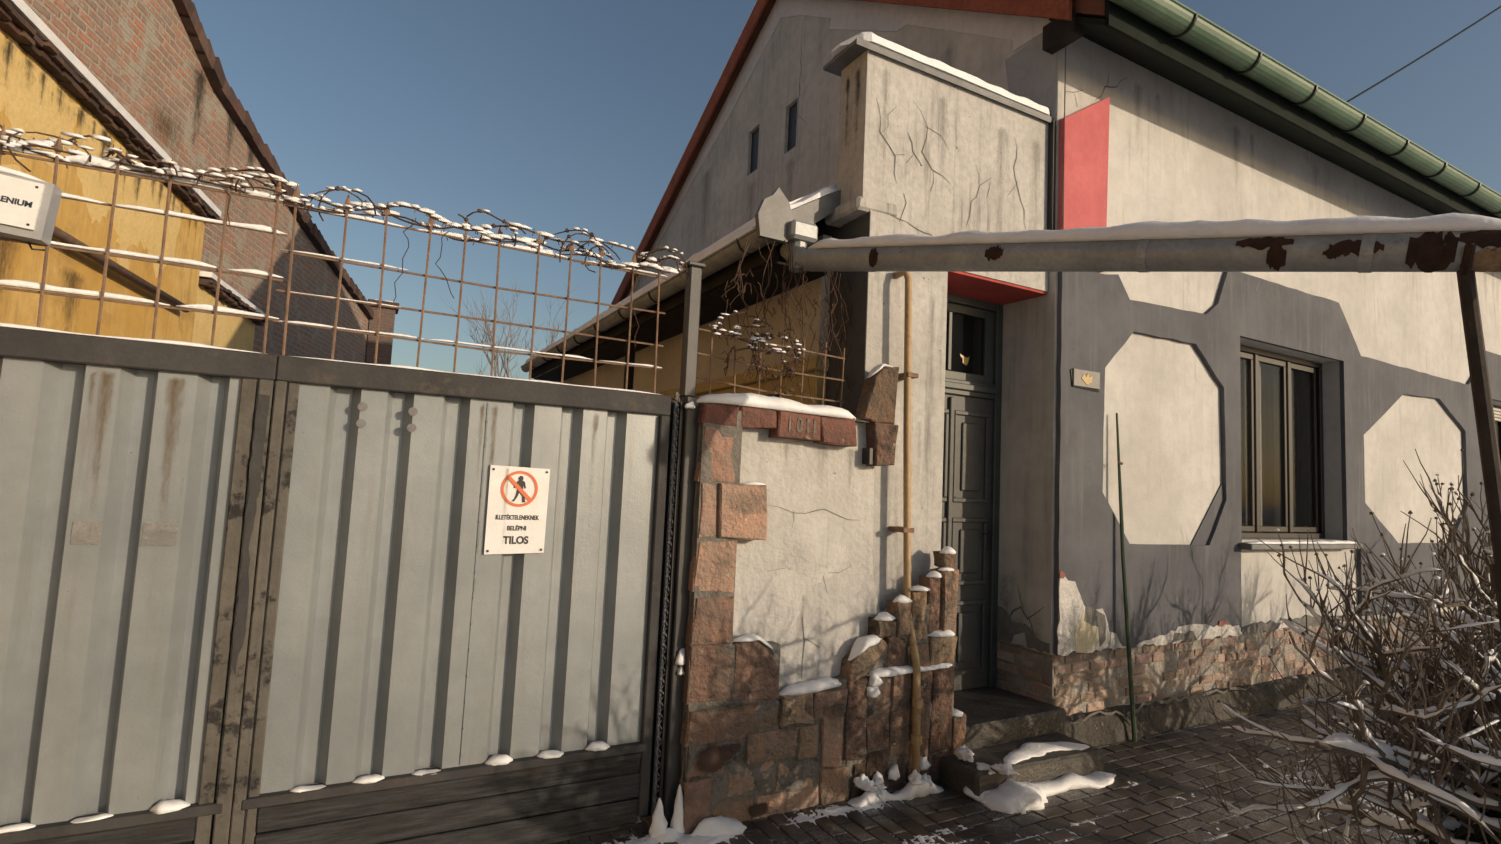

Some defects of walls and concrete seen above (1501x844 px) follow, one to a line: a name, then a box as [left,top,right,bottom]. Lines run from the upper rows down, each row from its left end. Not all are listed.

peeling [0,30,183,279]
crack [876,98,1026,236]
rust [1235,236,1295,271]
rust [1322,239,1385,259]
rust [1405,230,1501,273]
peeling [997,570,1355,656]